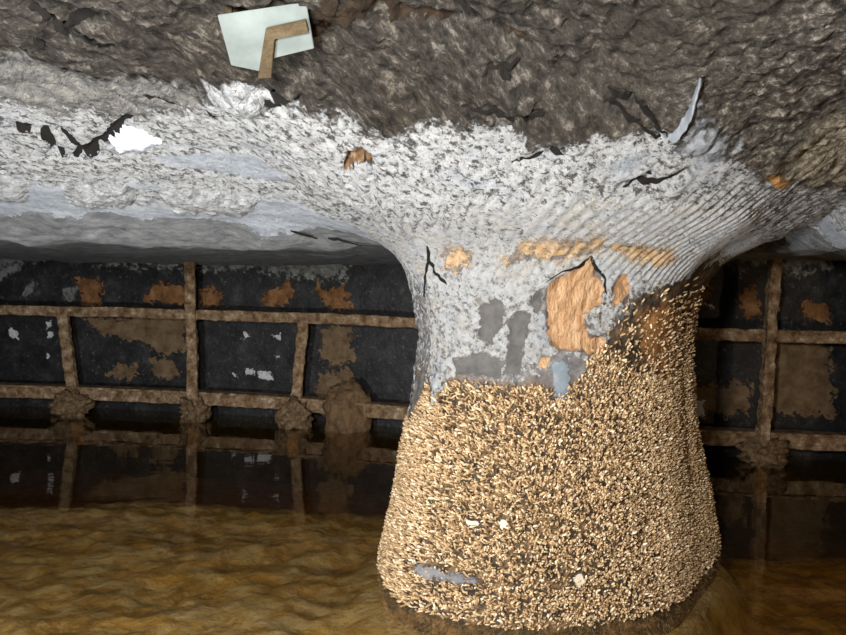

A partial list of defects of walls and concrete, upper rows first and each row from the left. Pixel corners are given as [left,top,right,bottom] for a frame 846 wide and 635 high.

rust [140,280,185,306]
rust [199,282,223,308]
rust [261,278,295,310]
rust [314,280,355,312]
spalling [454,259,631,379]
rust [735,283,762,321]
rust [801,299,831,325]
rust [315,324,359,397]
peeling [411,367,428,413]
peeling [538,357,571,400]
rust [695,377,758,421]
rust [773,342,839,421]